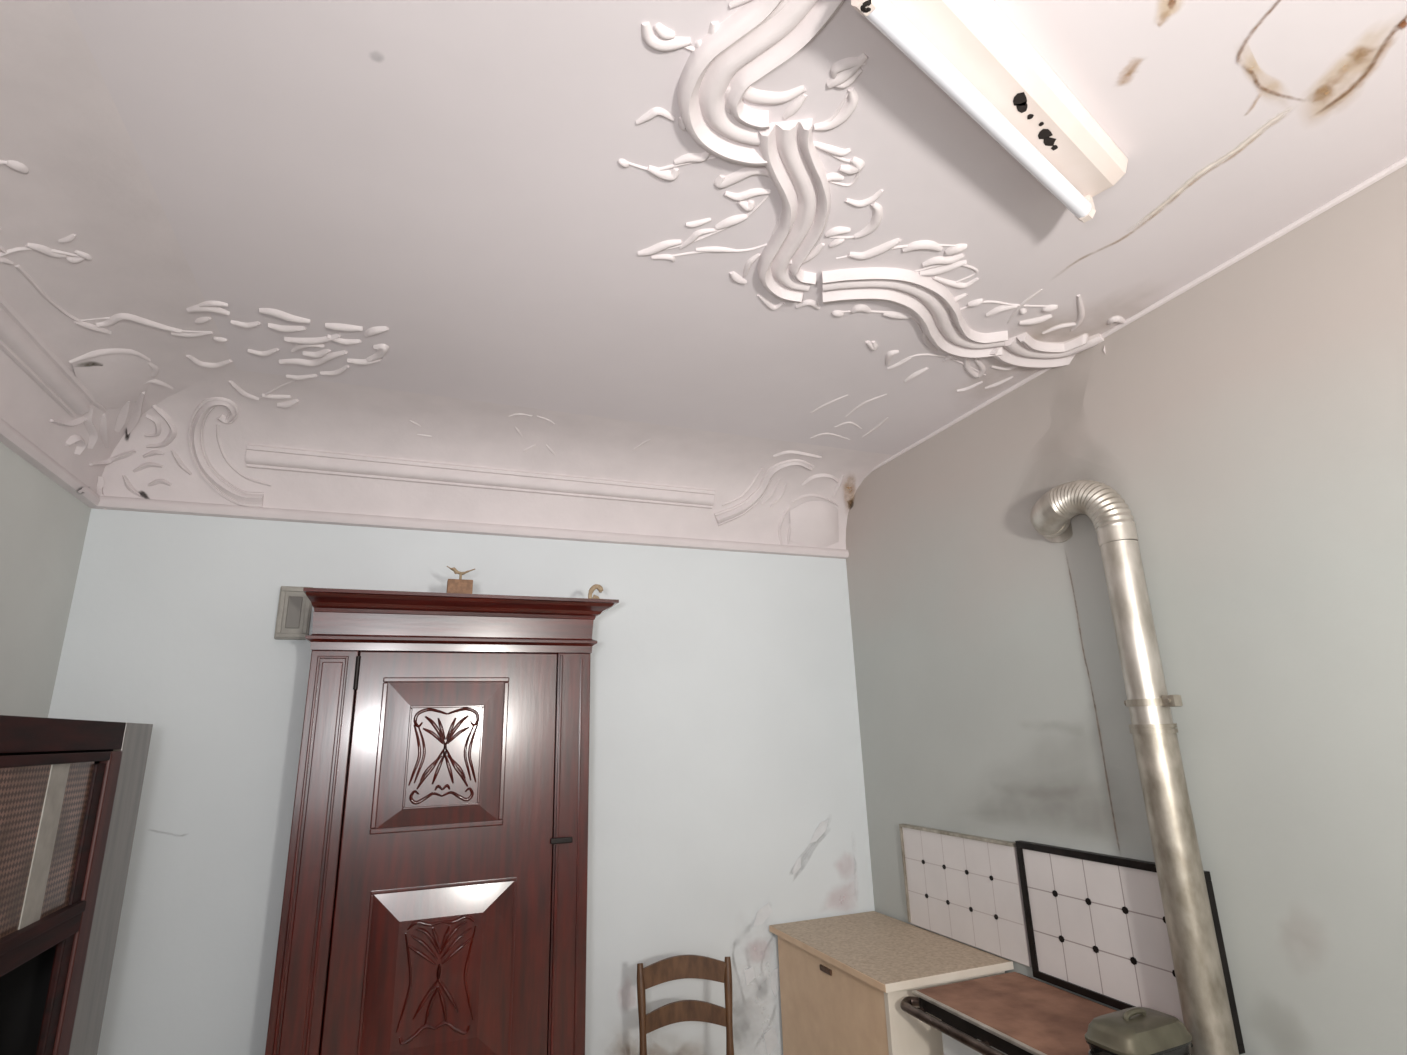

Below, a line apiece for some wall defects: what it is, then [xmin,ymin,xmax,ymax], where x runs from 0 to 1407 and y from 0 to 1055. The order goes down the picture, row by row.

crack [1238,0,1280,95]
crack [1324,17,1407,101]